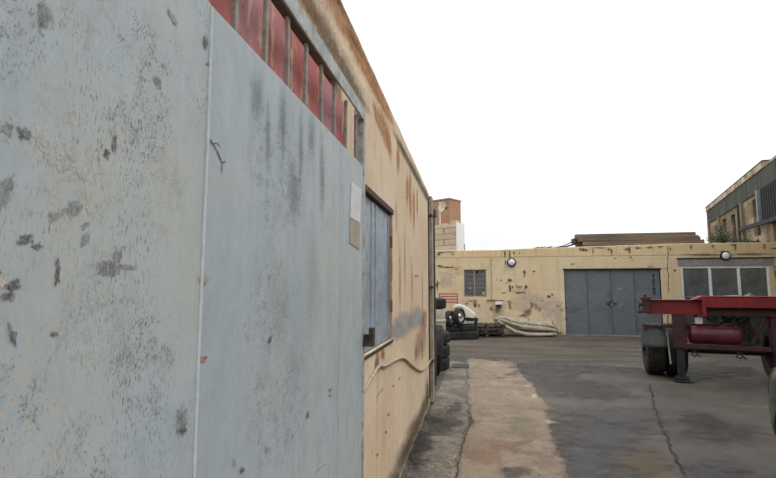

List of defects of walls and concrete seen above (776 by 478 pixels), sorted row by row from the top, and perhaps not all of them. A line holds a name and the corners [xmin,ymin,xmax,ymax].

peeling [29,0,142,52]
peeling [0,79,78,172]
rust [329,0,400,167]
peeling [0,172,17,210]
peeling [0,269,22,301]
spalling [16,233,44,250]
peeling [47,221,148,388]
crack [649,384,687,478]